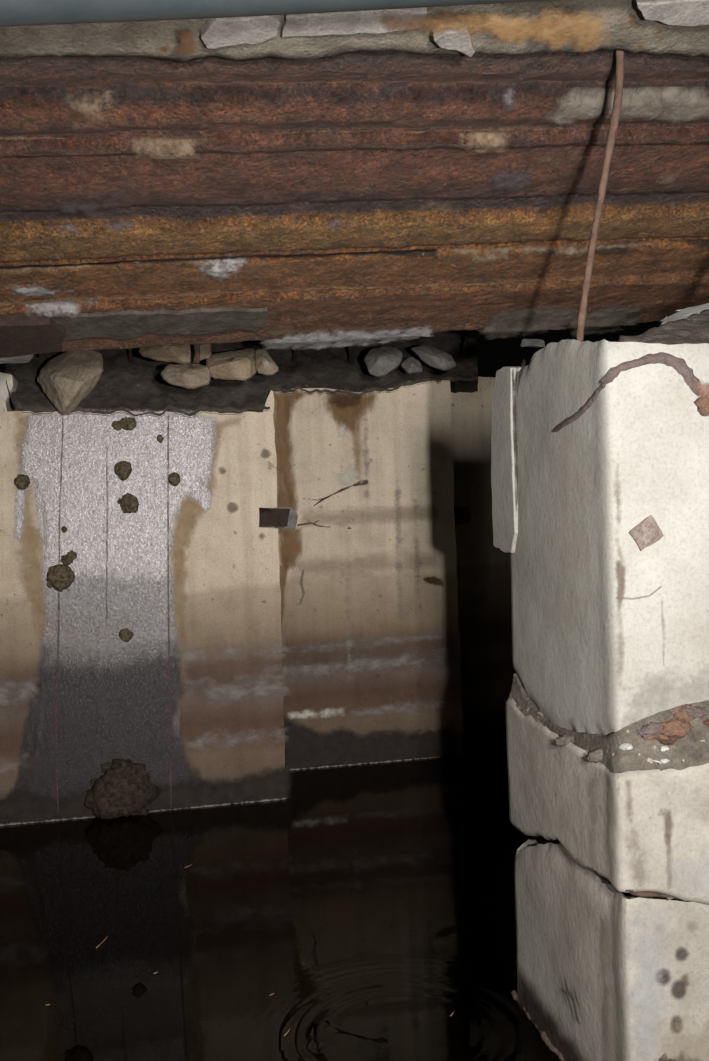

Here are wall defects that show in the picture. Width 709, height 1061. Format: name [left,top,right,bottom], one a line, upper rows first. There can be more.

rust [141,135,209,160]
rust [388,127,576,153]
rust [273,392,303,511]
rust [328,392,375,474]
spalling [694,394,709,416]
rust [278,529,301,622]
damp [0,412,454,825]
crack [625,889,695,902]
damp [518,971,582,1061]